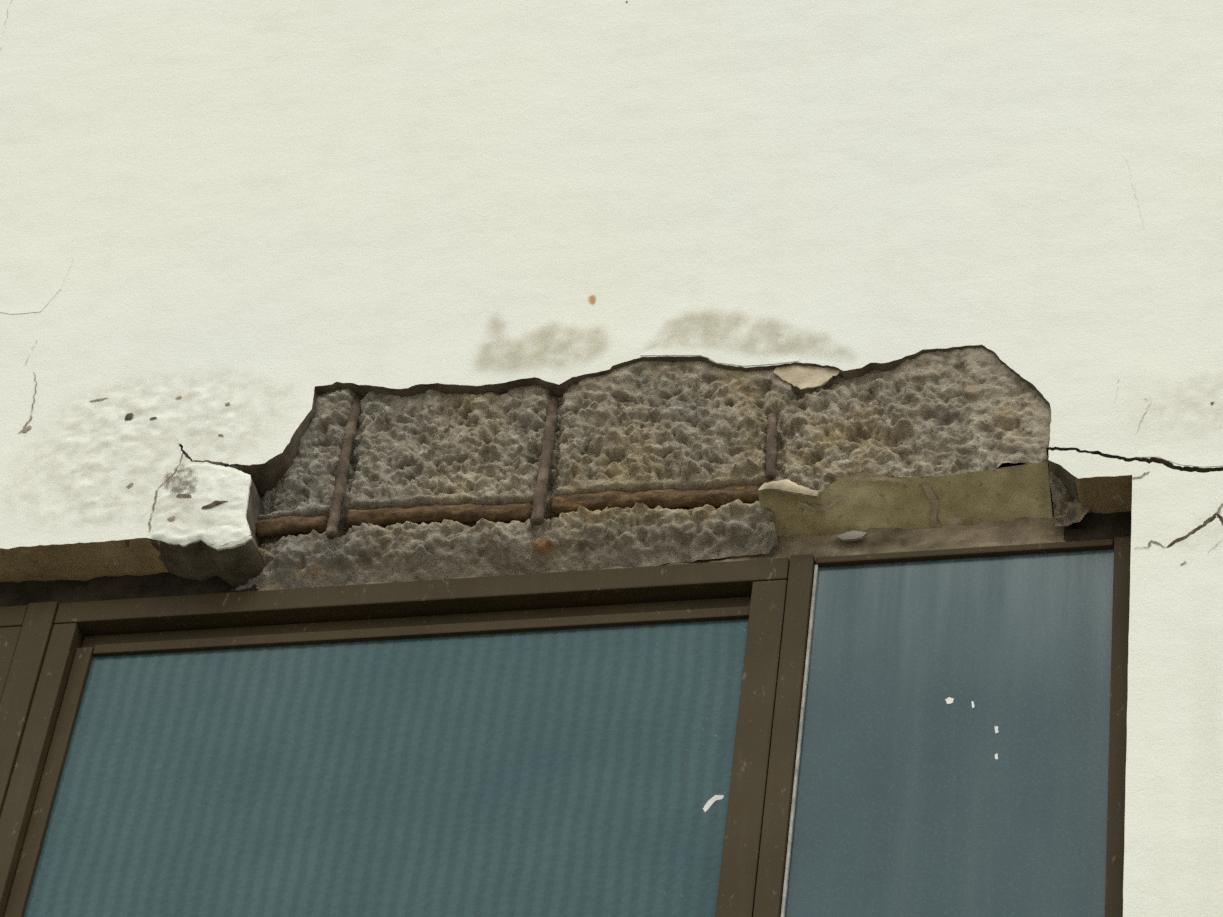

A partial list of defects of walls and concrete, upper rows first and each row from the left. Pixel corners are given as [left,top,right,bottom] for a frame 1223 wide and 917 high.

crack [18,360,37,434]
spalling [151,346,1092,590]
crack [1046,447,1223,479]
crack [1144,503,1223,548]